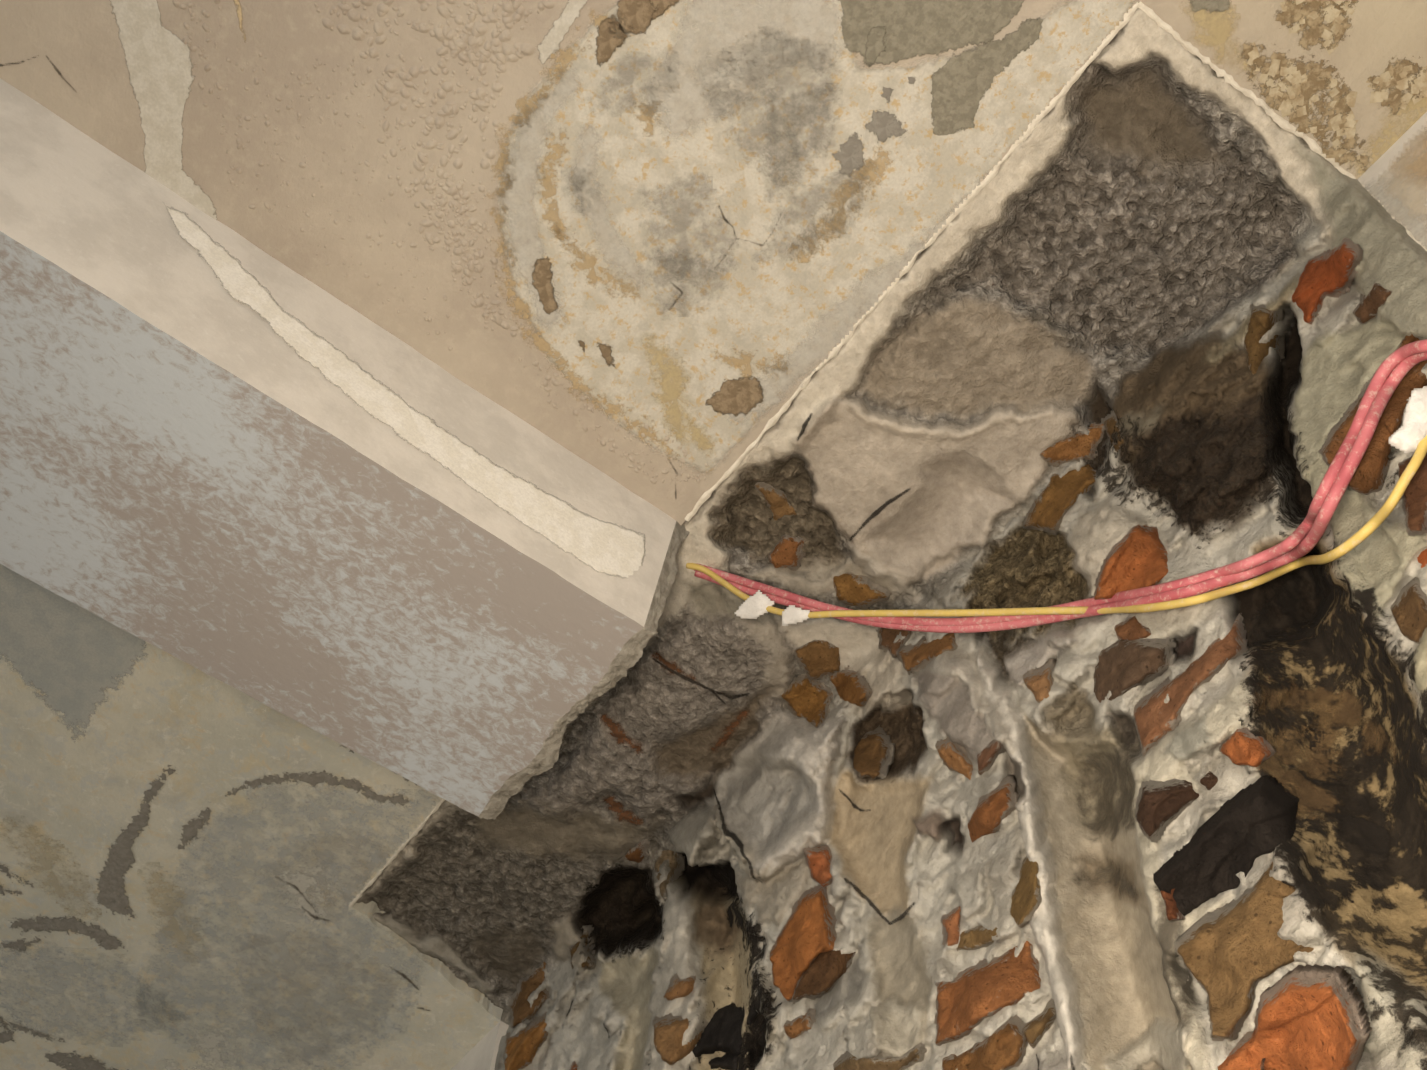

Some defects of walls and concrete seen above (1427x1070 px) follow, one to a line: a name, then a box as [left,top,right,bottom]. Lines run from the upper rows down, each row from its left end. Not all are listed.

peeling [109,0,645,578]
damp [490,0,1135,473]
spalling [348,0,1427,1070]
damp [1252,367,1313,544]
damp [1327,530,1427,738]
flaking render [0,765,176,952]
flaking render [178,807,211,849]
flaking render [225,770,409,808]
damp [1252,679,1427,1070]
flaking render [0,1017,128,1070]